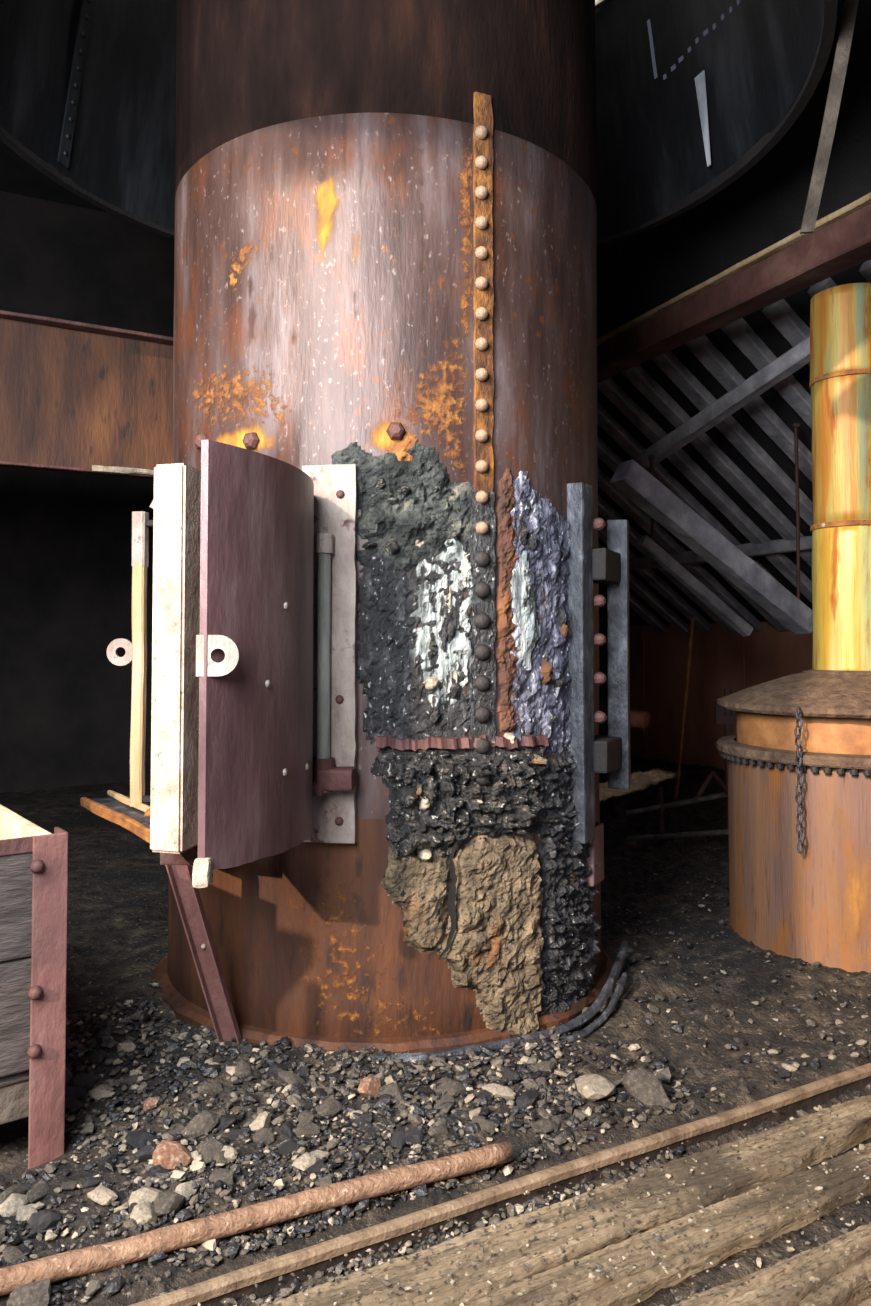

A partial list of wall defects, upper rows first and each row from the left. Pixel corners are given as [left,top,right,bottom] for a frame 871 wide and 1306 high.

rust [316,173,339,249]
rust [371,148,474,479]
rust [193,365,286,450]
peeling [331,433,480,724]
peeling [498,471,572,765]
peeling [416,784,430,811]
peeling [477,780,504,804]
rust [293,891,435,1036]
peeling [381,821,545,1036]